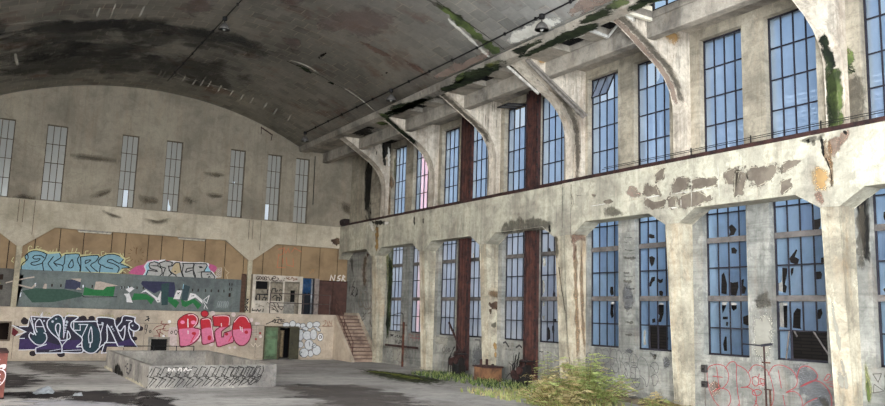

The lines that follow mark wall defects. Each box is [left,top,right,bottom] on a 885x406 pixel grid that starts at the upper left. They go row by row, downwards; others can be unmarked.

peeling [508,0,612,43]
damp [0,4,254,103]
spalling [627,159,802,210]